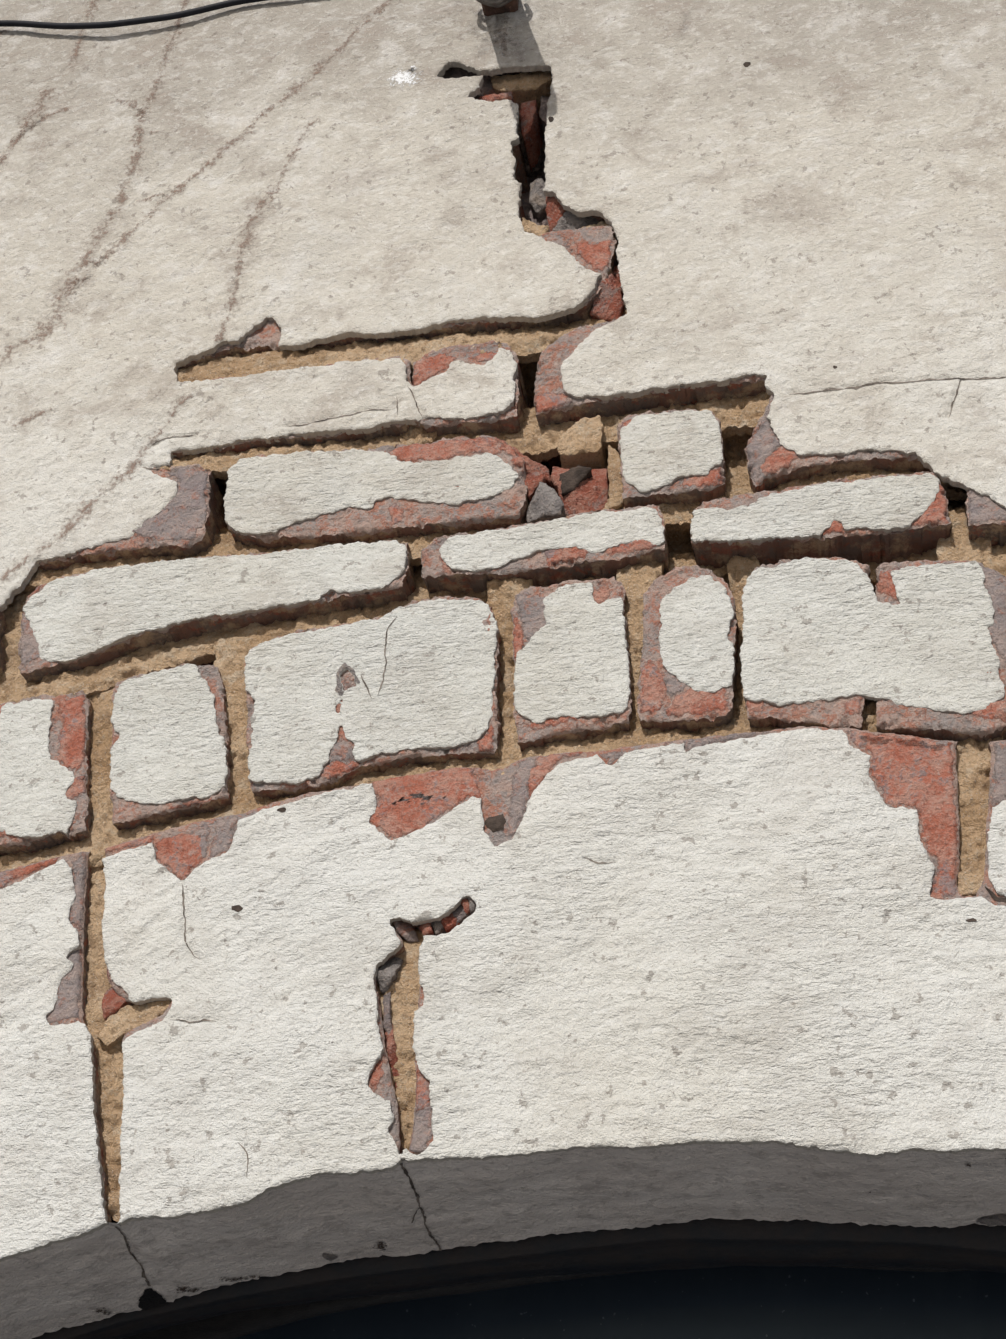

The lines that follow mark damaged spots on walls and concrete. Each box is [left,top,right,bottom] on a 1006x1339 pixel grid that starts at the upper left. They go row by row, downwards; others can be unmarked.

corrosion [476,0,519,51]
crack [292,387,424,426]
crack [143,435,194,469]
peeling [388,437,524,472]
peeling [746,407,798,482]
peeling [979,564,1006,673]
peeling [370,725,583,838]
peeling [843,696,959,900]
peeling [105,816,239,880]
peeling [47,951,83,1023]
crack [82,819,211,1287]
crack [376,897,476,1251]